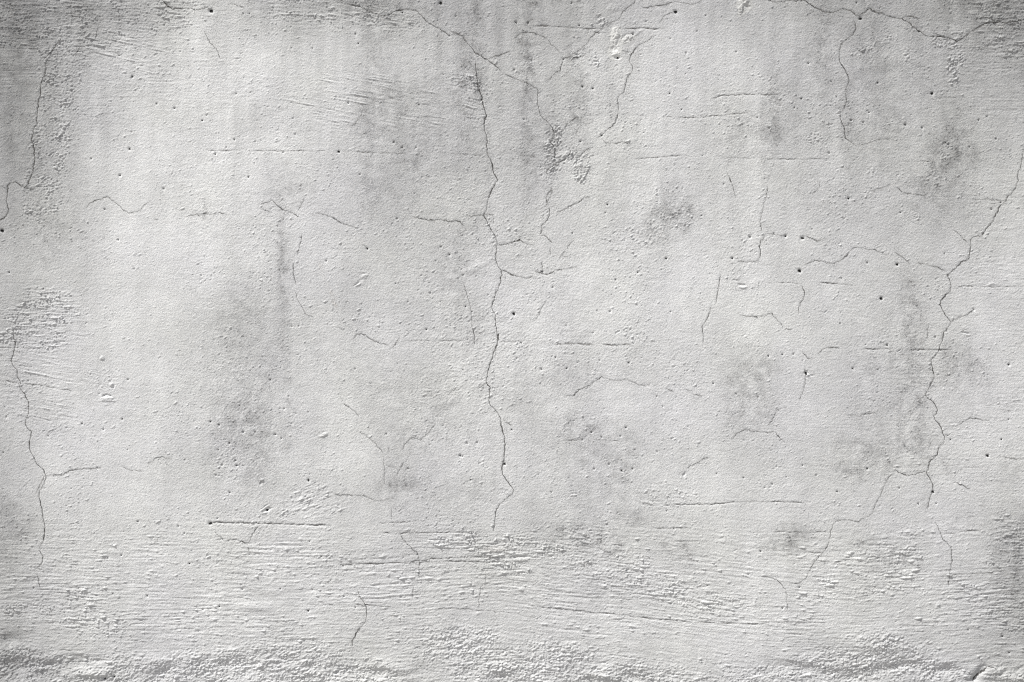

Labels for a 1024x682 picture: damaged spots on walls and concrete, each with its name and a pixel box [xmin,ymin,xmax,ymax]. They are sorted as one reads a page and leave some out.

crack [349,1,699,532]
crack [732,151,1024,609]
crack [770,0,1021,146]